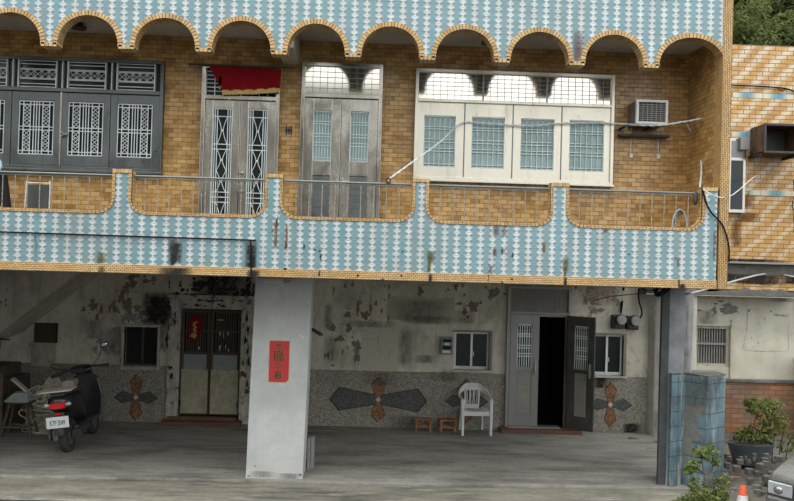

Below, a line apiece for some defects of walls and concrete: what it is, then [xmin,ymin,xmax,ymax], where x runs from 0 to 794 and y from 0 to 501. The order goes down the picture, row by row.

damp [200,244,259,295]
damp [144,293,169,324]
flaking render [80,274,255,356]
peeling [327,278,391,366]
peeling [445,278,513,320]
spalling [695,287,794,323]
peeling [238,310,250,394]